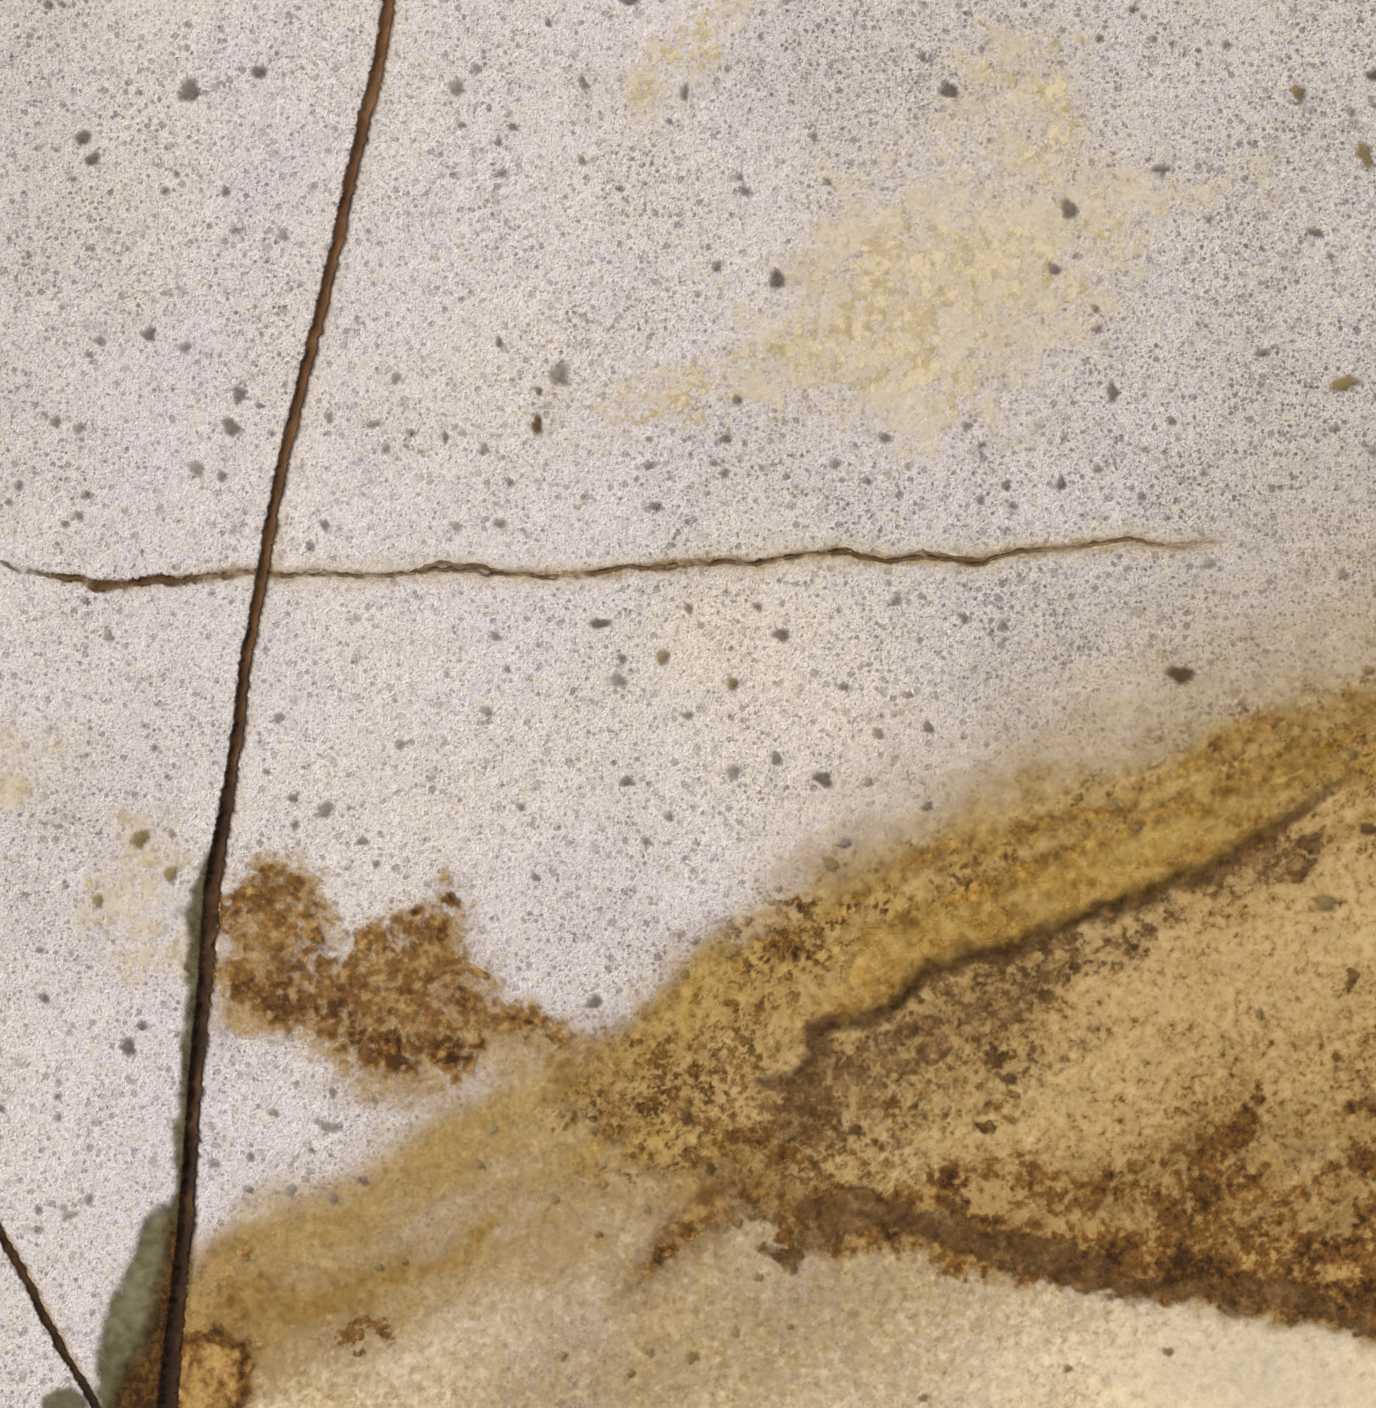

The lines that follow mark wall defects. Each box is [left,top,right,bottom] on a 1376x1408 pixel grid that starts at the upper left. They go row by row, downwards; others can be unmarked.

crack [0,0,1042,1408]
leakage [42,679,1376,1408]
crack [1077,536,1162,548]